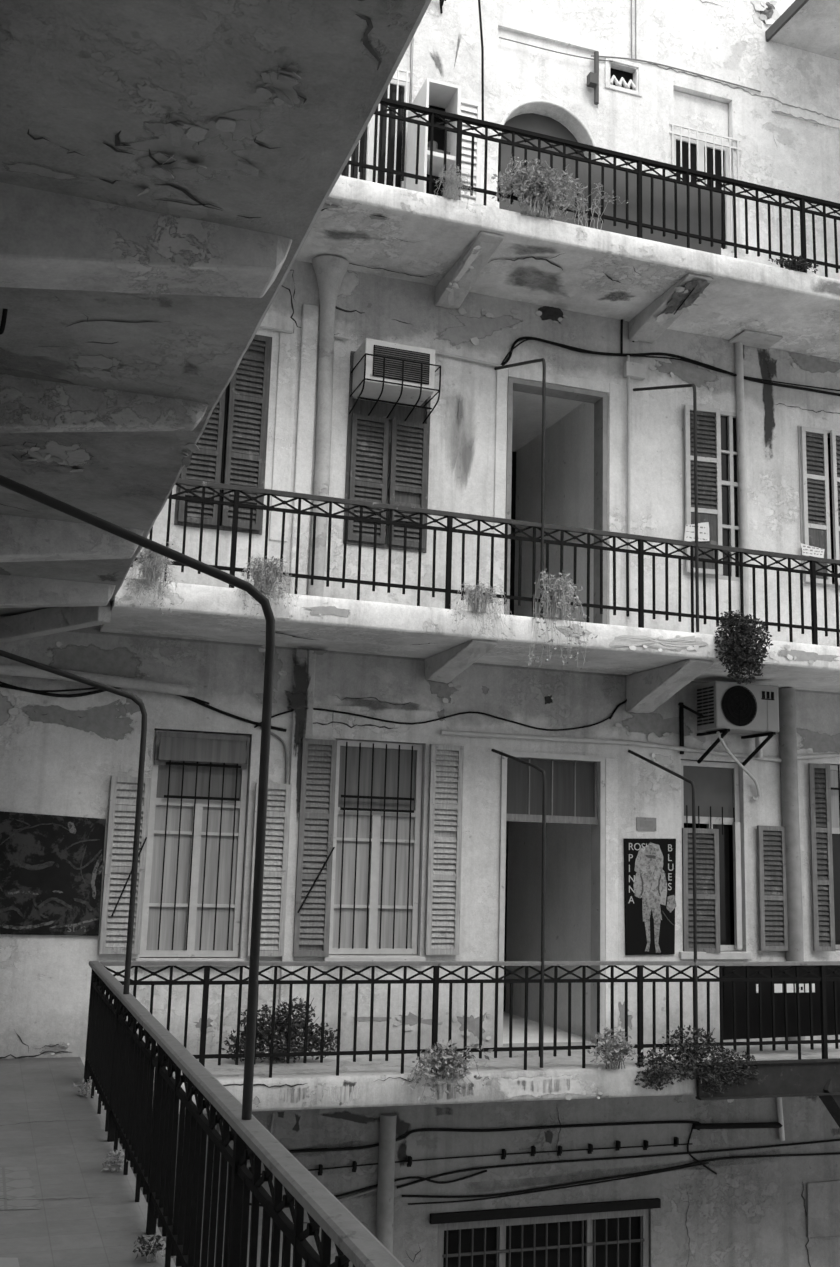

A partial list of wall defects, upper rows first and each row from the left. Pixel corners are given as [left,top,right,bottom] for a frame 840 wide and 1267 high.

crack [356,0,382,70]
peeling [104,108,263,211]
peeling [446,245,481,292]
crack [282,270,301,333]
peeling [437,270,568,349]
spalling [656,280,710,322]
peeling [3,440,92,472]
leakage [454,400,472,477]
peeling [48,641,150,680]
peeling [0,689,142,740]
leakage [285,657,311,818]